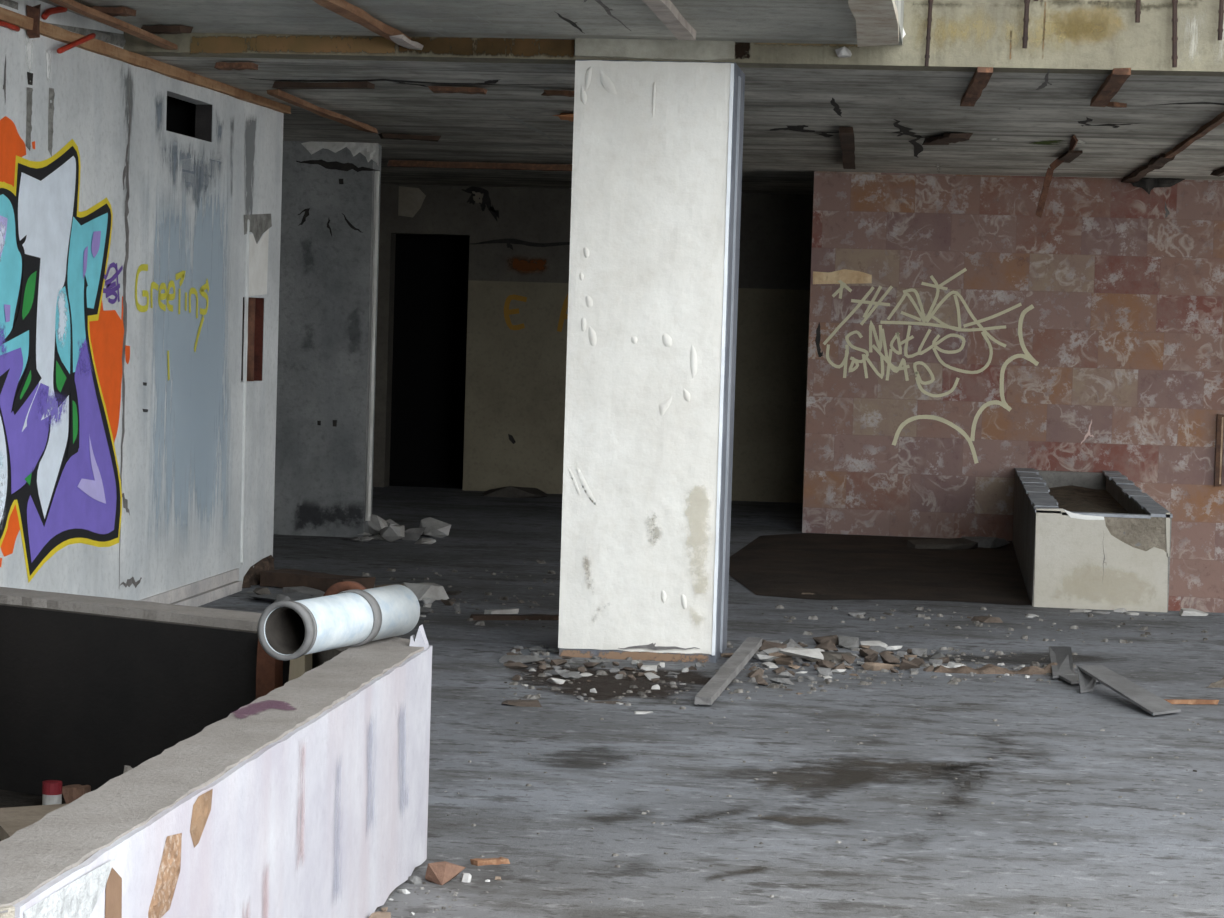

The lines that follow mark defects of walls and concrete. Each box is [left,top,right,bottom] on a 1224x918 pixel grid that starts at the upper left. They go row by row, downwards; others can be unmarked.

crack [555,0,631,34]
spalling [1022,0,1038,48]
flaking render [398,186,426,217]
flaking render [301,141,379,521]
spalling [1064,510,1166,551]